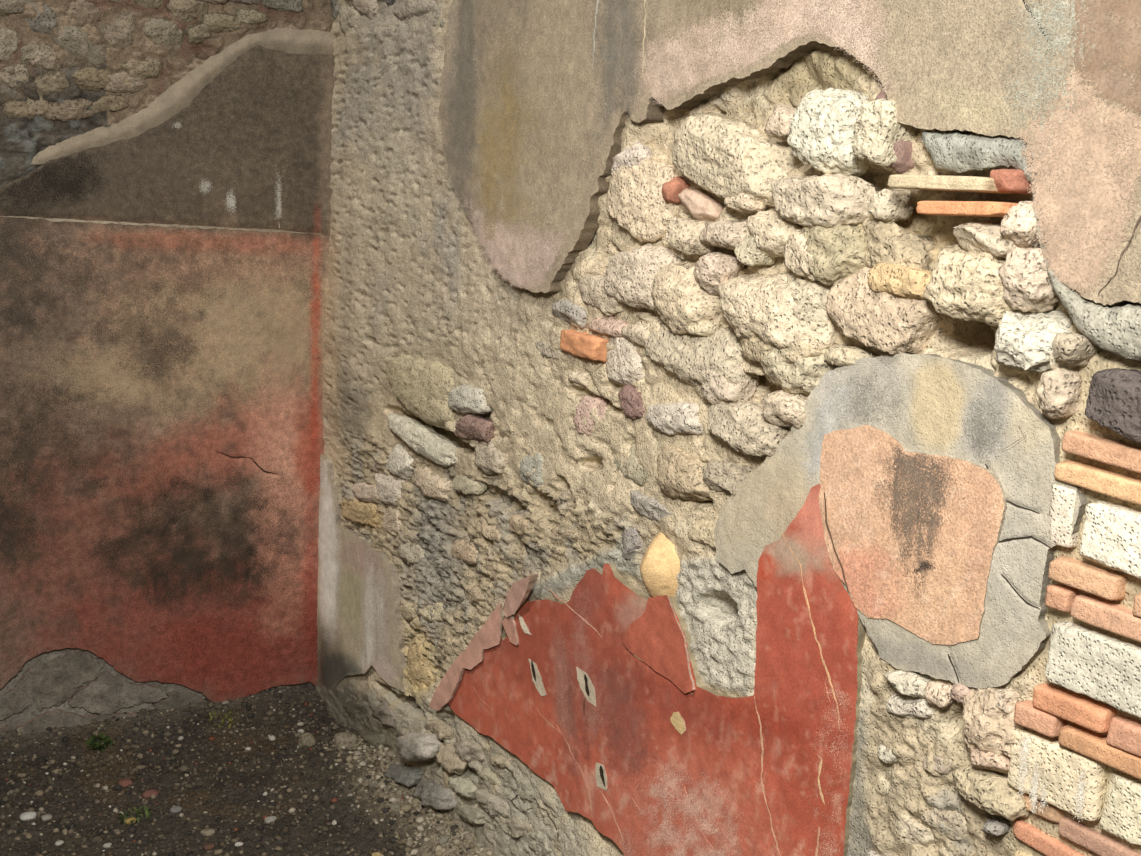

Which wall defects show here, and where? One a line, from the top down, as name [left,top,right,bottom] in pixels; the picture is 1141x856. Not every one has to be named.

spalling [0,0,446,151]
crack [1098,216,1141,296]
damp [0,173,389,689]
crack [216,451,278,475]
spalling [336,0,1141,856]
damp [800,365,969,604]
damp [961,389,1007,463]
crack [782,534,840,729]
crack [754,696,825,856]